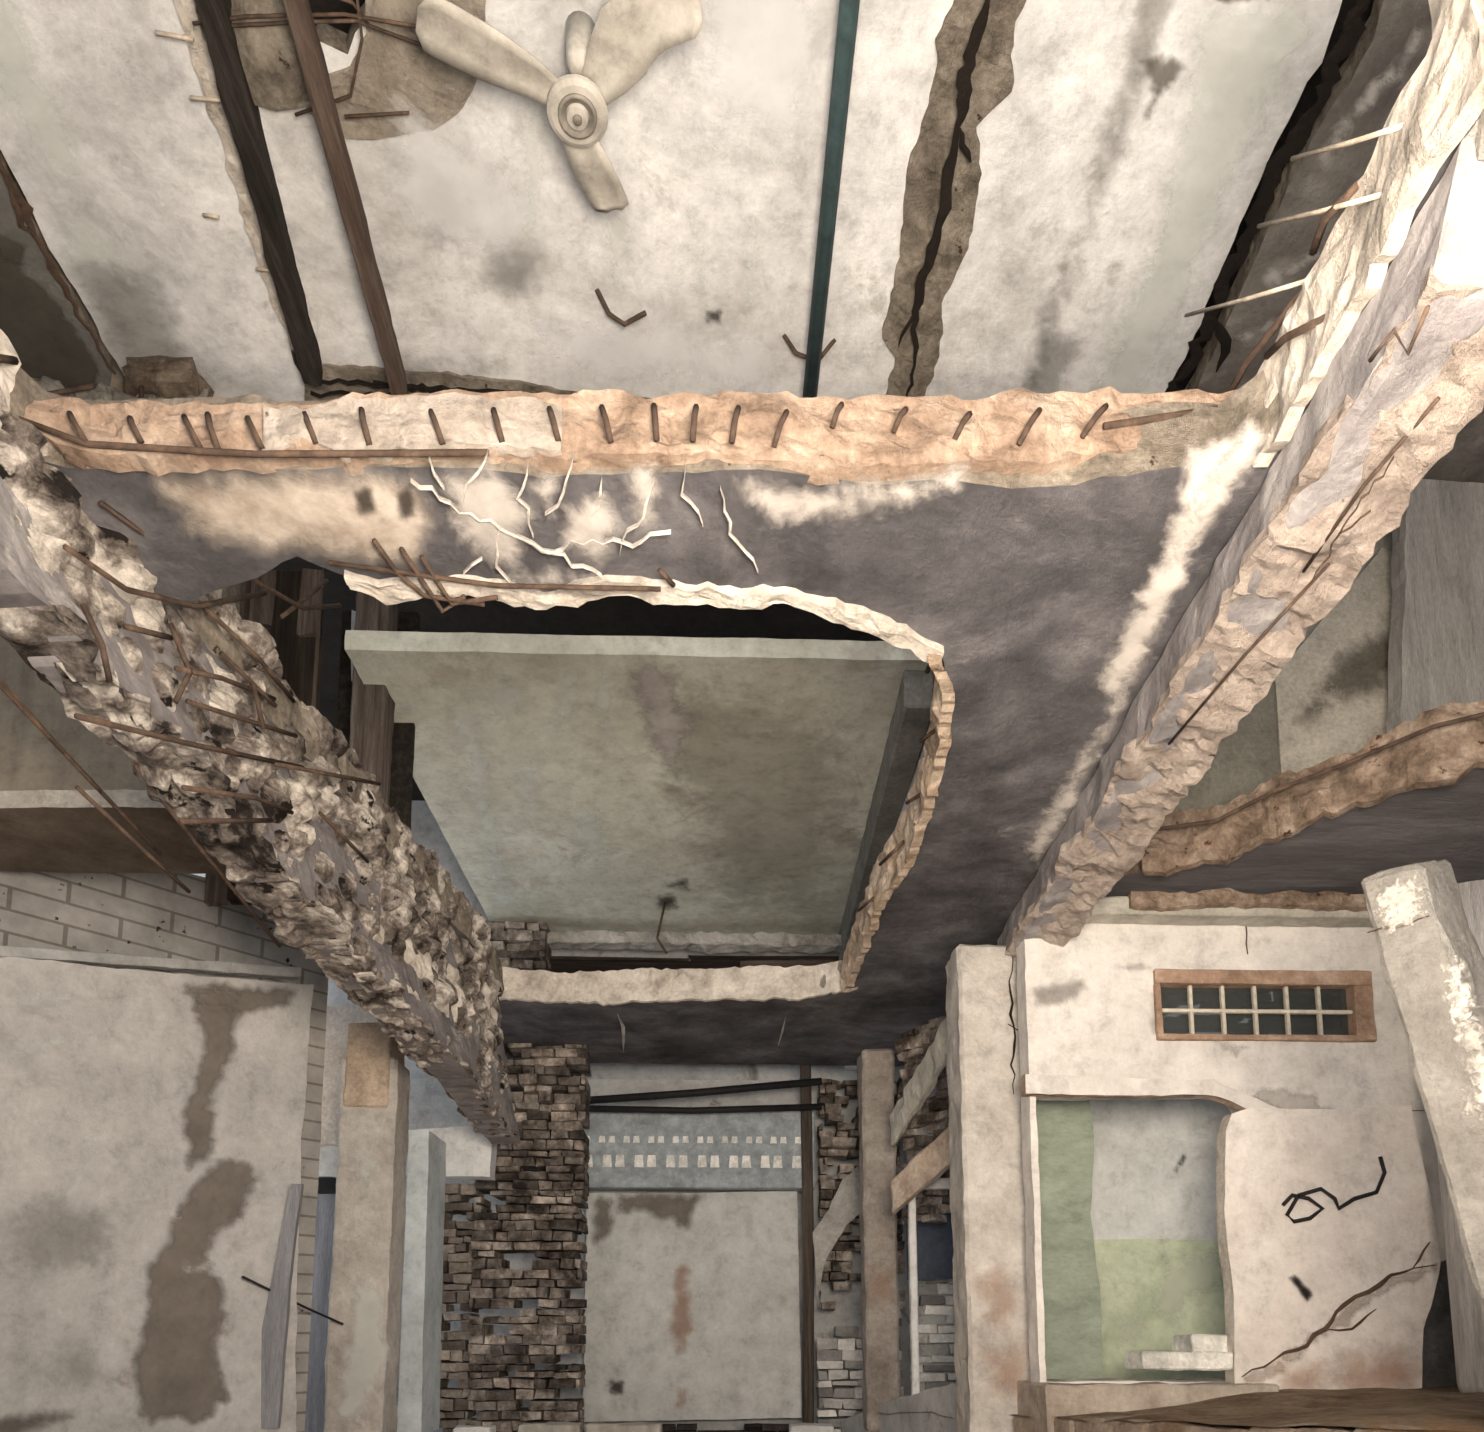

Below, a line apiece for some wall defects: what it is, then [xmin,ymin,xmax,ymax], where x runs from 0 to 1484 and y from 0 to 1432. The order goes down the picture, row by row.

crack [310,378,526,399]
spalling [0,0,1484,1137]
crack [898,0,990,397]
water stain [134,984,293,1423]
crack [1241,1242,1436,1377]